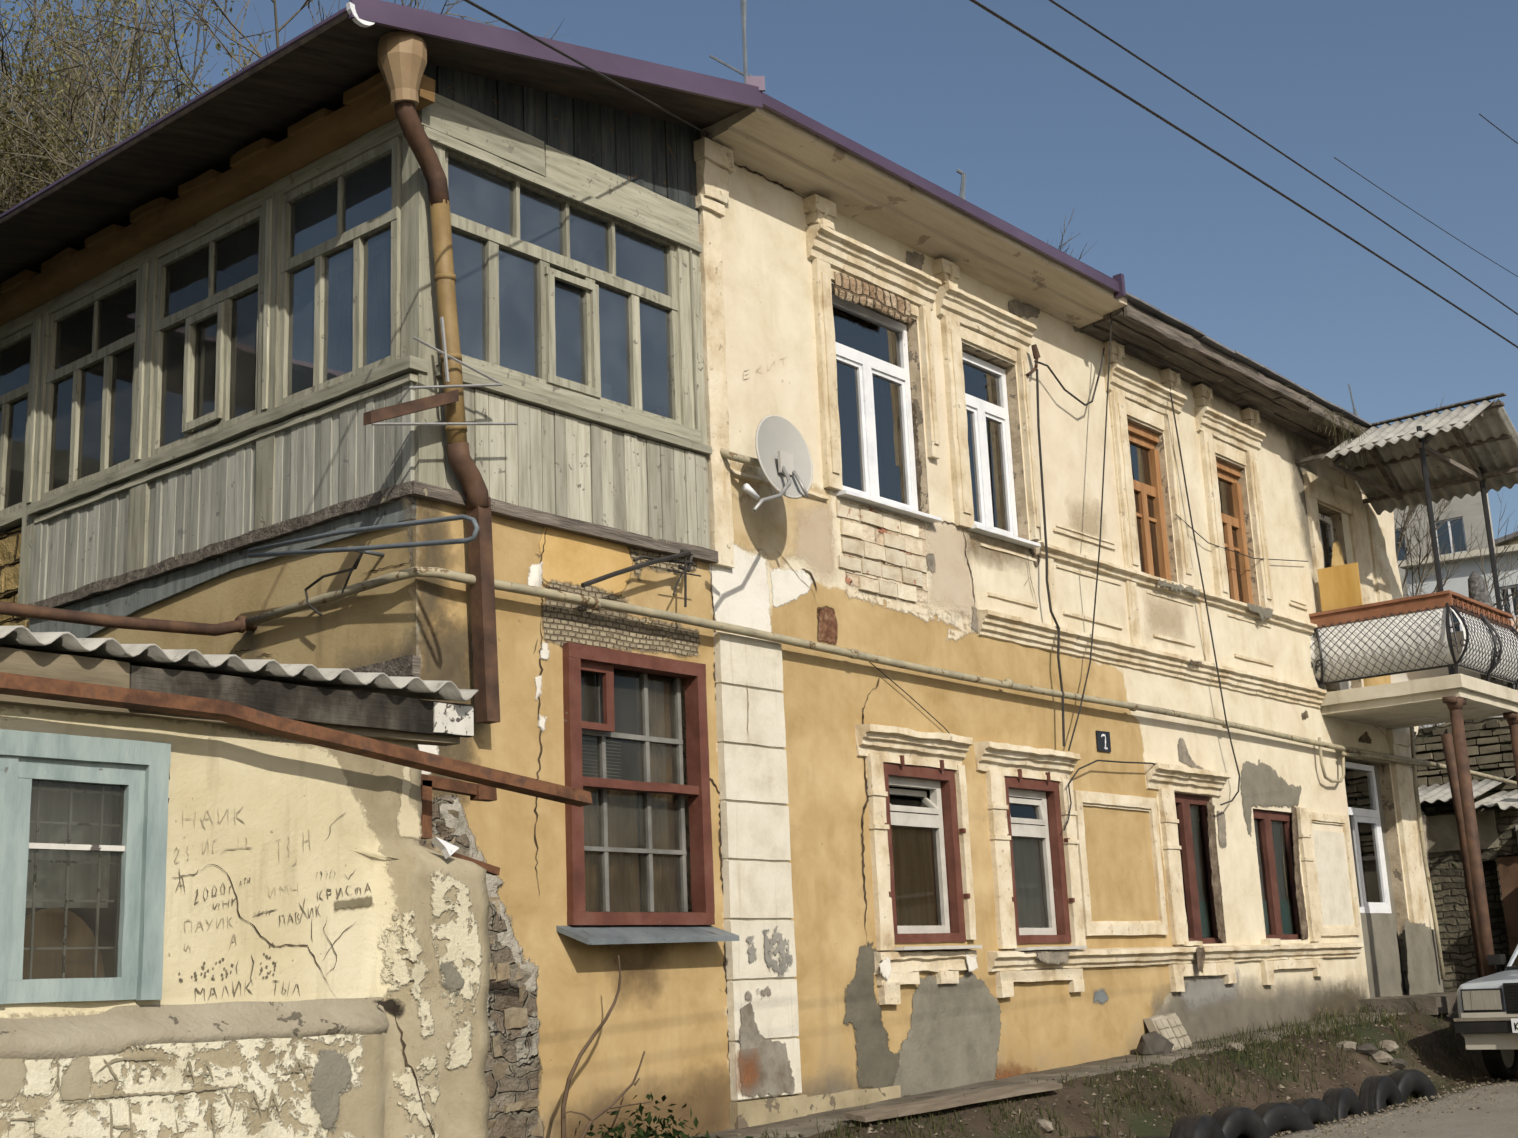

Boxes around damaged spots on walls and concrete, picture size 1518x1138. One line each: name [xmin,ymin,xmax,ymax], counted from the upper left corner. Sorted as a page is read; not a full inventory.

flaking render [730,402,981,641]
crack [534,528,584,893]
peeling [0,1034,364,1138]
crack [201,864,352,995]
flaking render [377,766,544,1138]
peeling [738,926,795,1098]
spalling [879,956,892,979]
spalling [965,952,978,972]